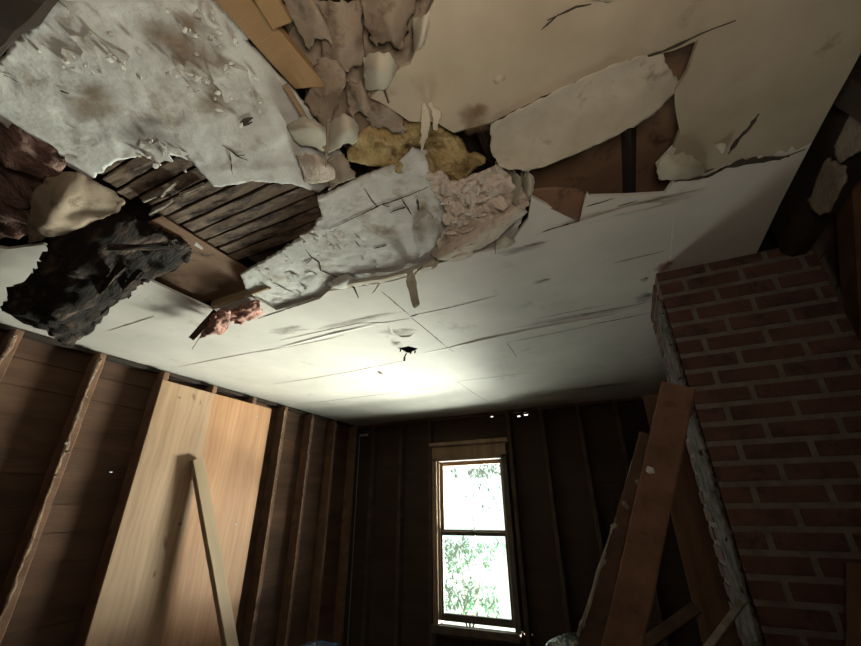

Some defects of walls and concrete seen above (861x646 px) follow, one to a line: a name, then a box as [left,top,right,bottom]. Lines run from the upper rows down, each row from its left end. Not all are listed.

spalling [48,0,71,18]
peeling [411,10,430,52]
spalling [59,30,143,79]
spalling [166,0,259,129]
peeling [362,52,398,91]
spalling [135,137,192,173]
peeling [287,113,359,191]
spalling [285,161,535,308]
crack [304,249,344,277]
crack [258,284,318,319]
crack [380,290,497,352]
crack [179,323,362,367]